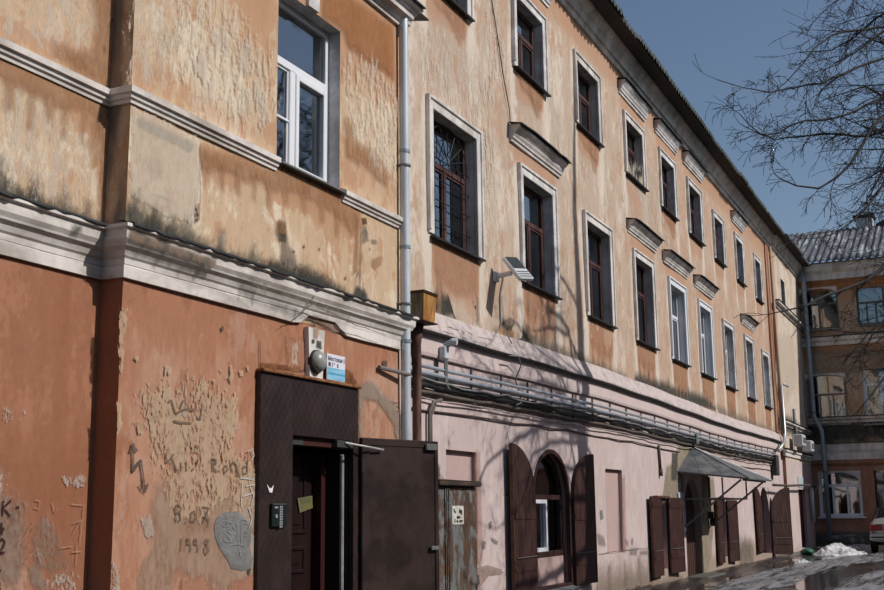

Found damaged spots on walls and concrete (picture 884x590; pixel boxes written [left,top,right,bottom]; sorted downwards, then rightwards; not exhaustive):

peeling [128,0,276,134]
water stain [0,60,109,223]
water stain [125,203,256,269]
water stain [266,222,368,299]
flaking render [118,308,128,373]
peeling [61,475,86,489]
peeling [134,364,256,590]
peeling [0,473,78,590]
flaking render [112,563,120,590]